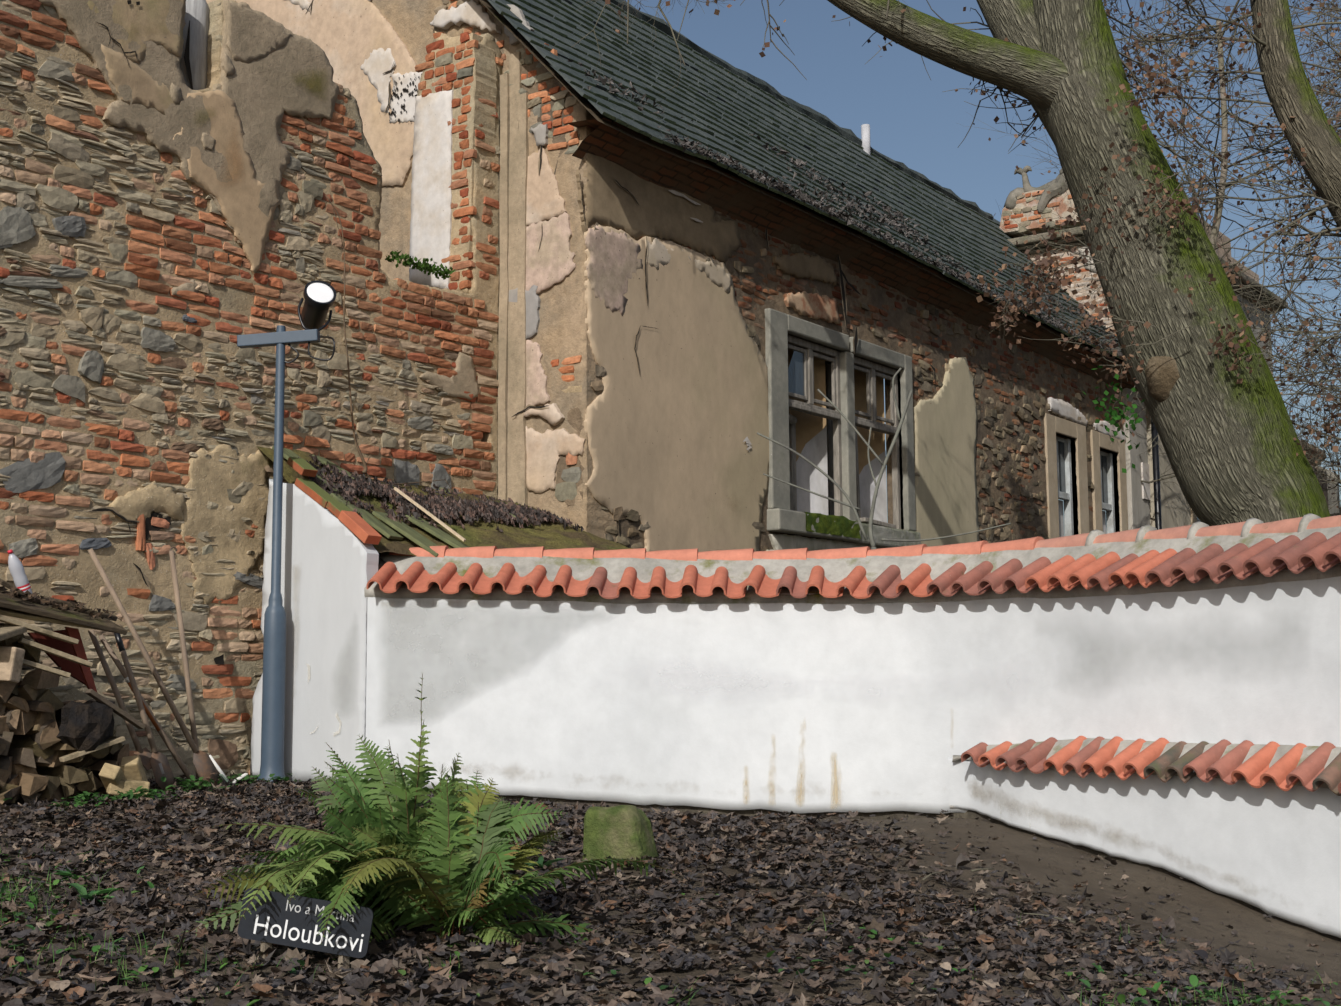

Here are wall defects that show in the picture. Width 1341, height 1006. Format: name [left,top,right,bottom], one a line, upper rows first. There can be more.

flaking render [360,48,423,124]
flaking render [39,0,339,274]
flaking render [171,279,198,297]
flaking render [430,0,1126,552]
flaking render [419,352,479,400]